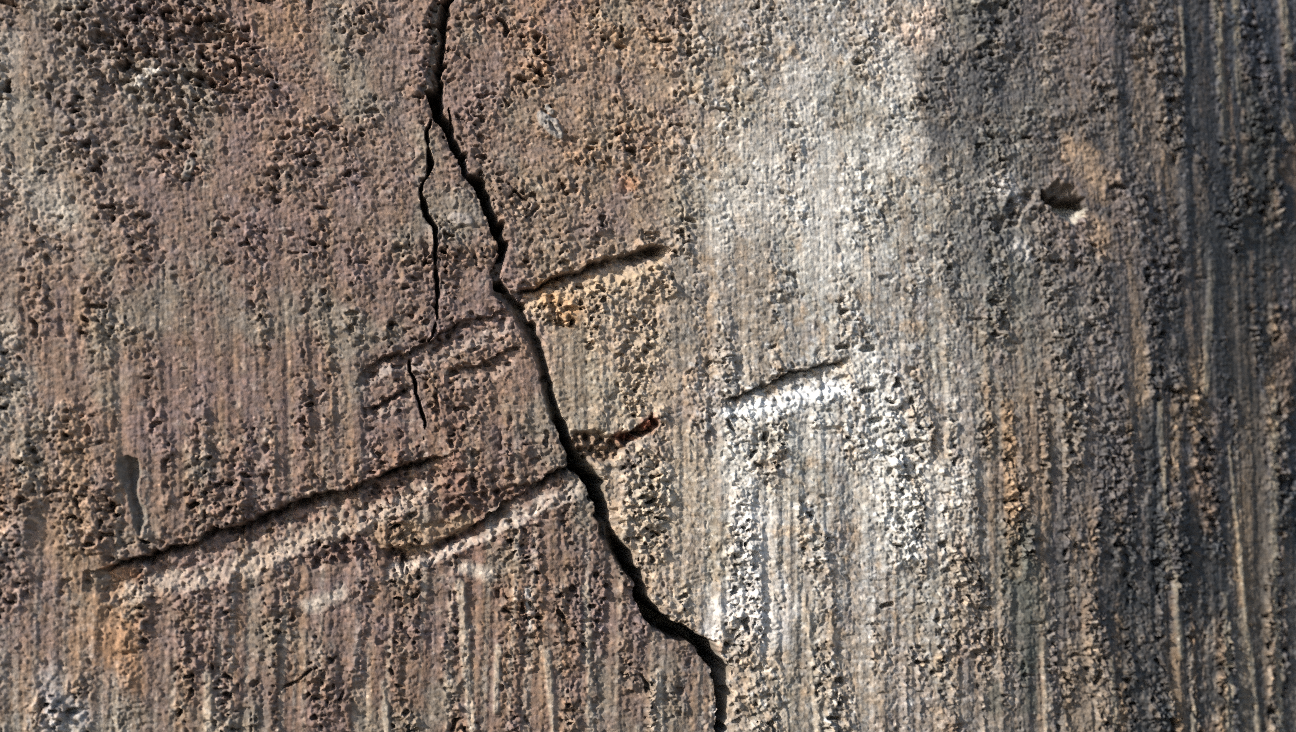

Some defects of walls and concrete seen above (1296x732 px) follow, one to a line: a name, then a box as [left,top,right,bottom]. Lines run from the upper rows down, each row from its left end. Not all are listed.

crack [271,667,313,707]
crack [407,0,736,732]
water stain [1071,0,1296,732]